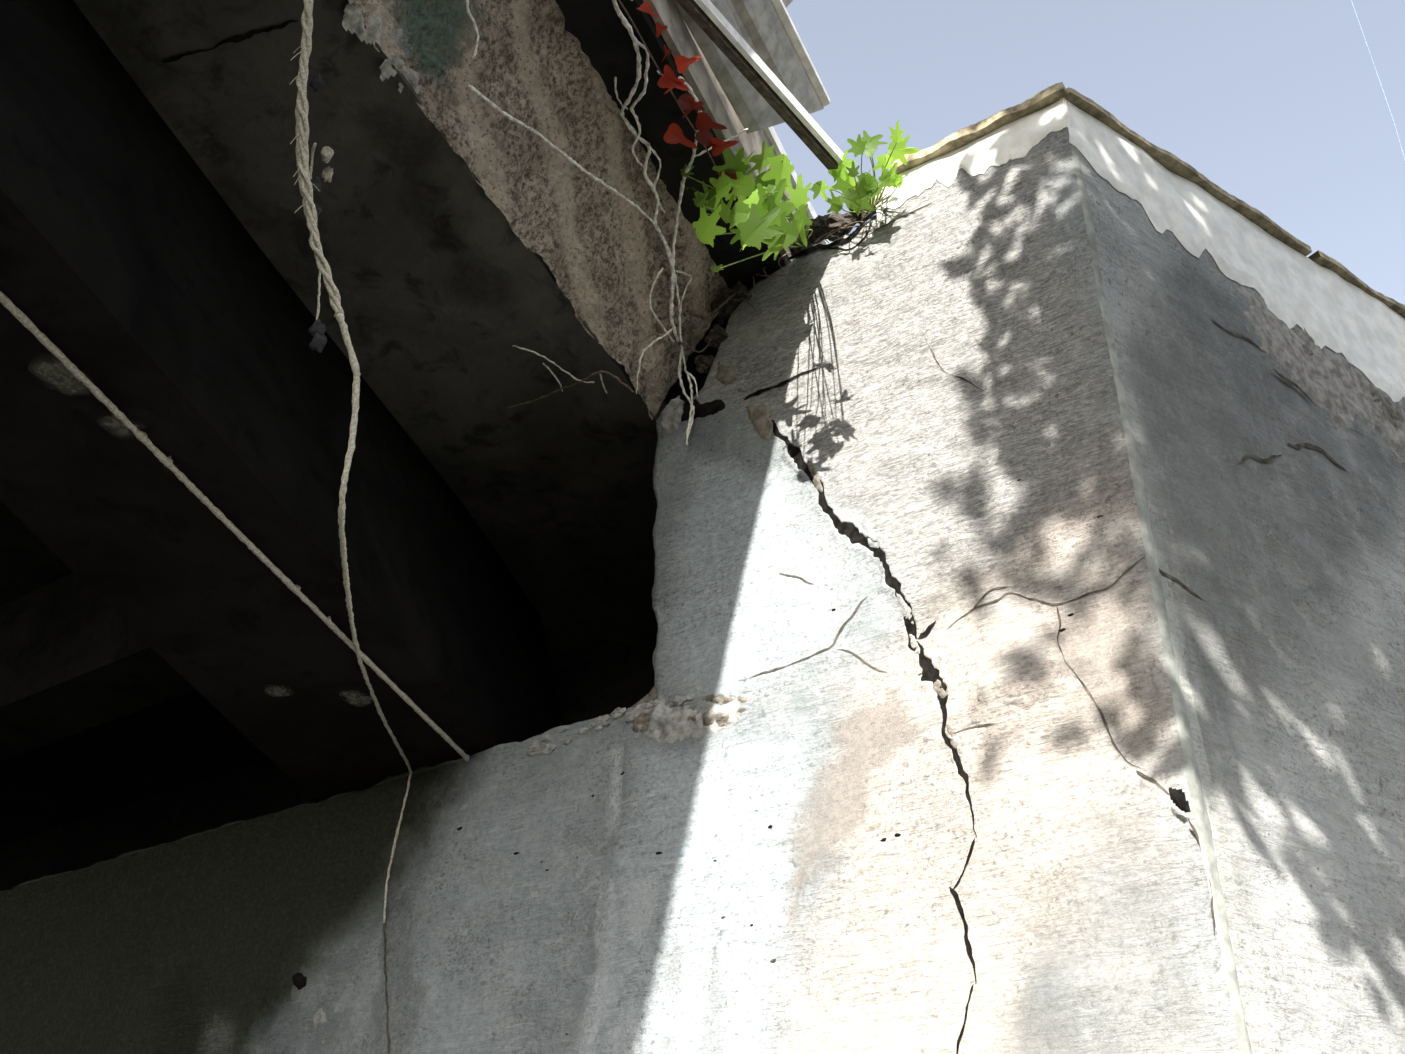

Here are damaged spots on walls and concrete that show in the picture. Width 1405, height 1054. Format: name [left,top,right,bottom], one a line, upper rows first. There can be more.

crack [162,20,297,63]
damp [35,361,87,393]
crack [921,331,987,393]
damp [343,691,372,705]
spalling [526,693,748,756]
crack [737,409,1205,1054]